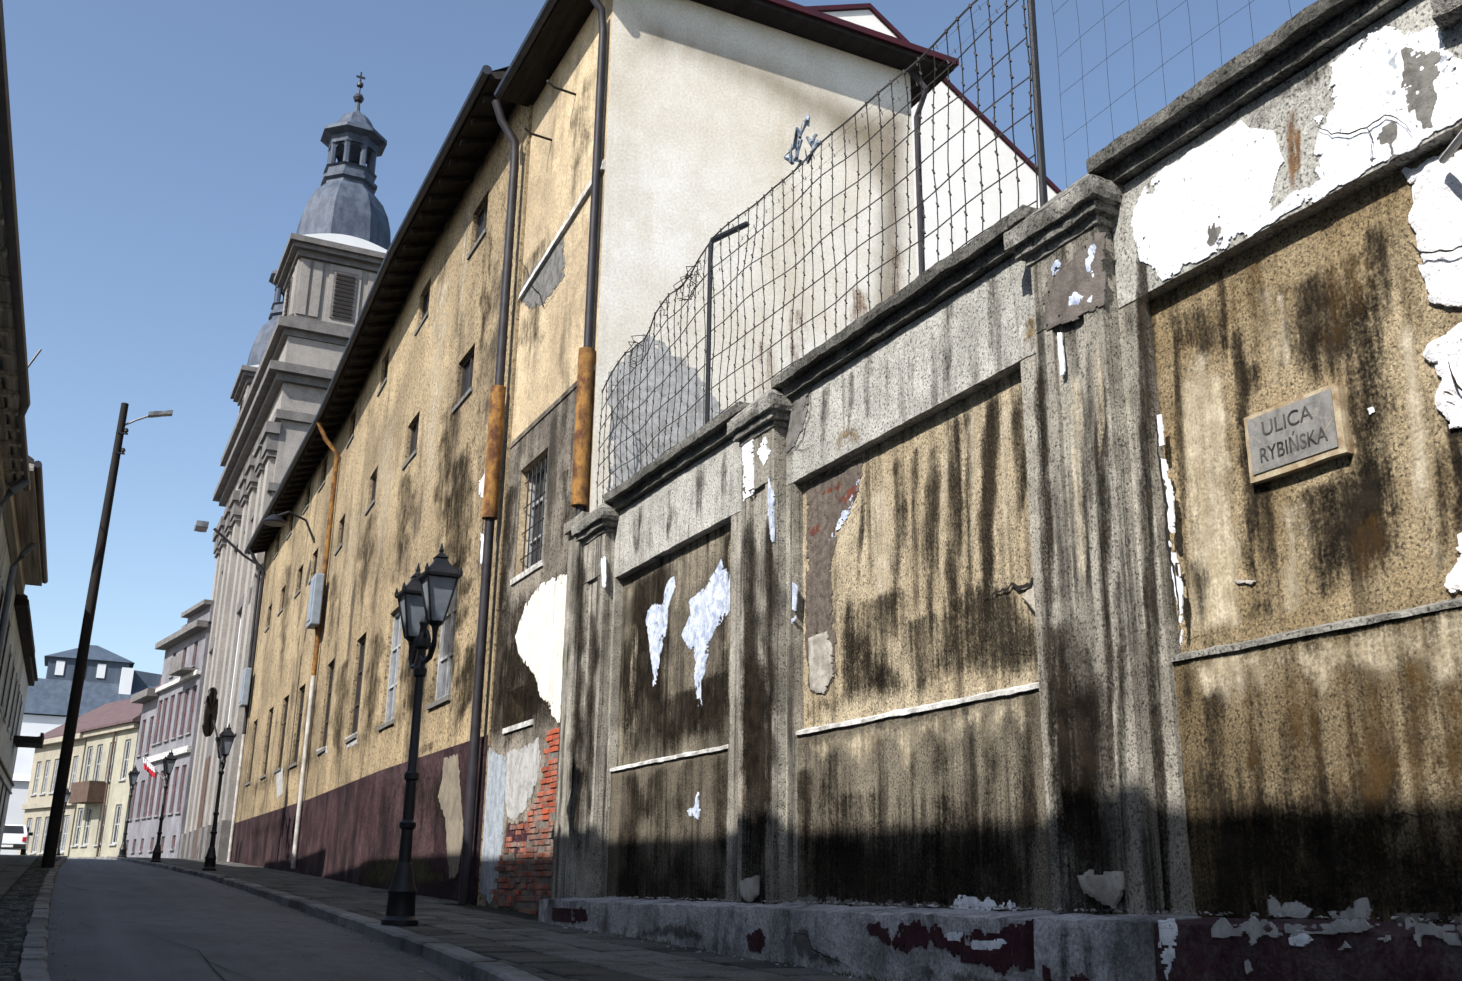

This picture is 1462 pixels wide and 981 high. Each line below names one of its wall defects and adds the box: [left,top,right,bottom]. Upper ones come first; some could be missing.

peeling [1131,25,1462,281]
crack [1407,242,1462,254]
damp [328,184,492,719]
crack [1444,362,1462,396]
damp [304,633,385,763]
flaking render [491,727,588,924]
peeling [646,559,730,707]
damp [616,513,778,904]
spalling [791,457,863,695]
damp [797,352,1130,981]
damp [1136,228,1462,924]
peeling [1211,895,1462,974]